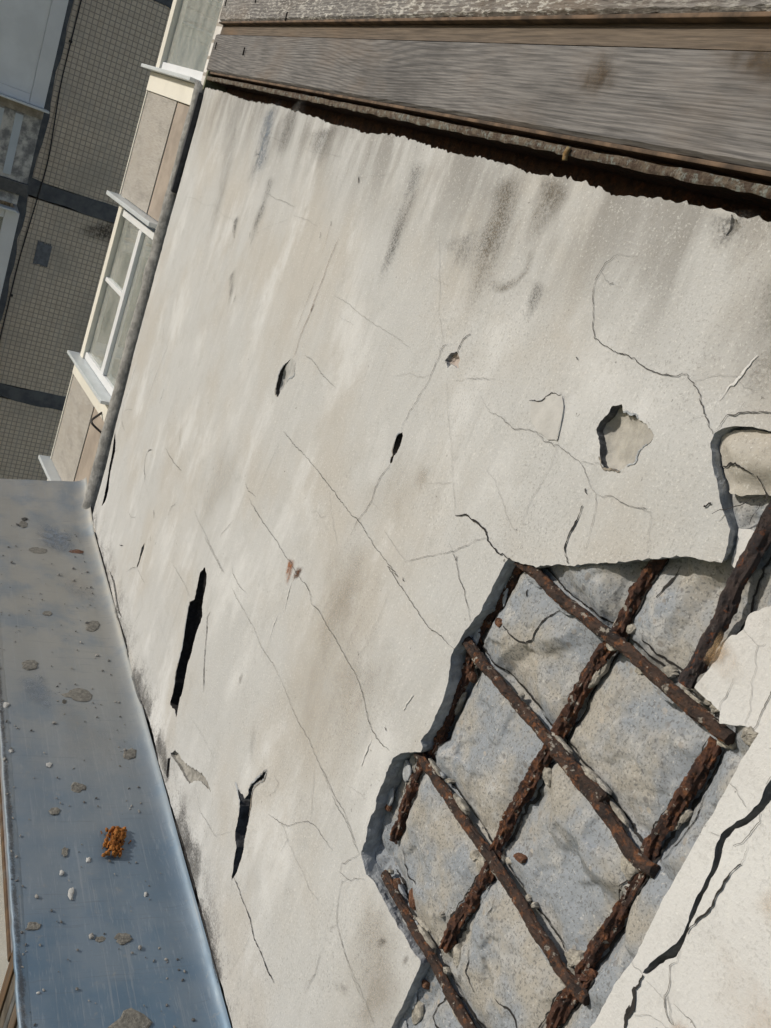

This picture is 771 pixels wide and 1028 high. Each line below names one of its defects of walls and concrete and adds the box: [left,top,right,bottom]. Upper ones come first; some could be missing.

water stain [483,185,511,256]
spalling [275,358,295,397]
spalling [596,404,654,472]
spalling [170,568,205,716]
spalling [361,426,771,1028]
spalling [232,769,267,879]
crack [624,778,771,1028]